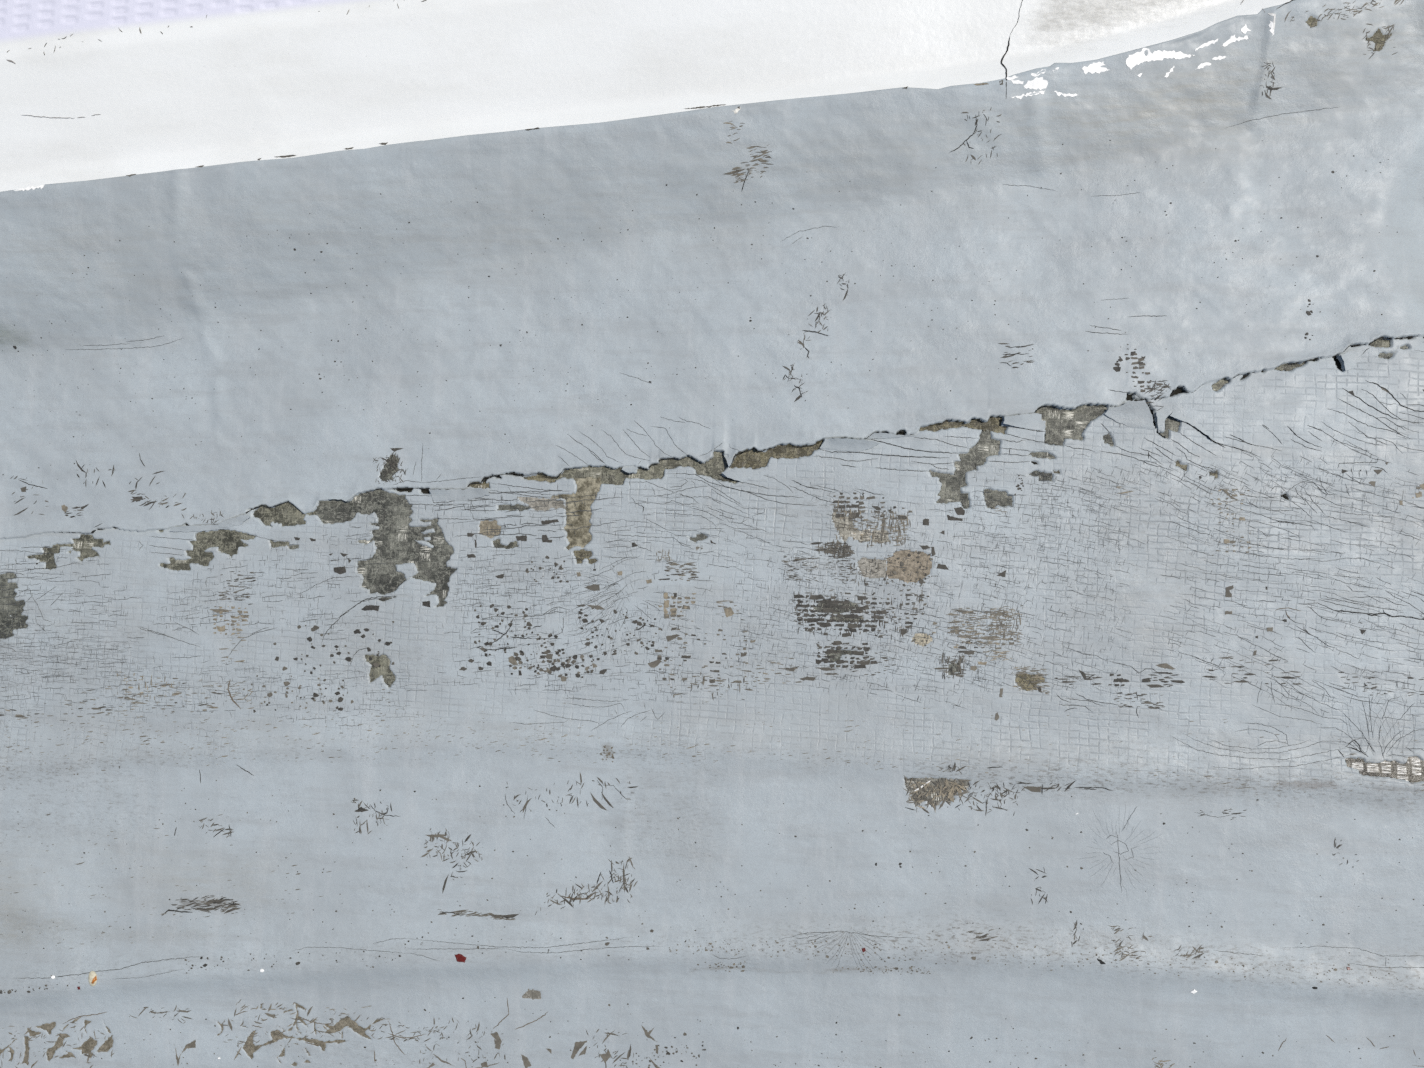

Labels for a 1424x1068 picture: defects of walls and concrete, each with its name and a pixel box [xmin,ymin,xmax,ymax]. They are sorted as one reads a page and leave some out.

peeling [974,67,1077,99]
peeling [1082,62,1110,74]
peeling [1126,24,1251,77]
peeling [1263,0,1404,59]
peeling [0,430,1185,720]
crack [0,330,1424,770]
peeling [1202,619,1301,685]
peeling [1339,672,1424,696]
peeling [904,763,1075,816]
peeling [1345,756,1424,783]
peeling [0,1012,114,1068]